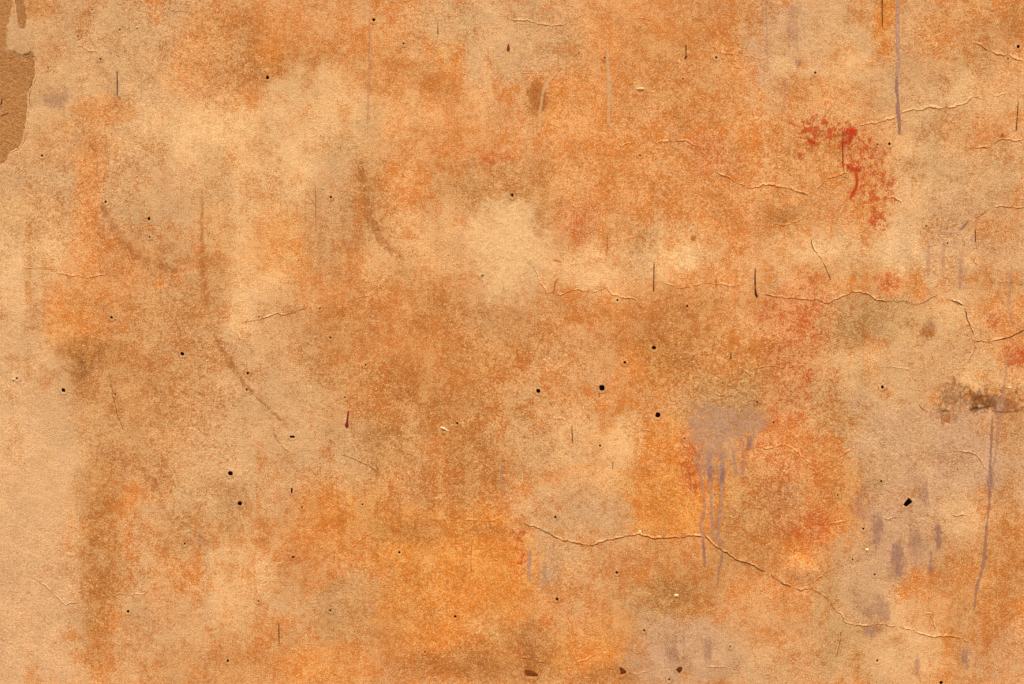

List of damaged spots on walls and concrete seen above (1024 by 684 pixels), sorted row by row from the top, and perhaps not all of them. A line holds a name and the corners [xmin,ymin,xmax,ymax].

flaking render [0,0,49,166]
corrosion [787,113,904,233]
crack [715,170,1024,363]
crack [413,512,970,659]